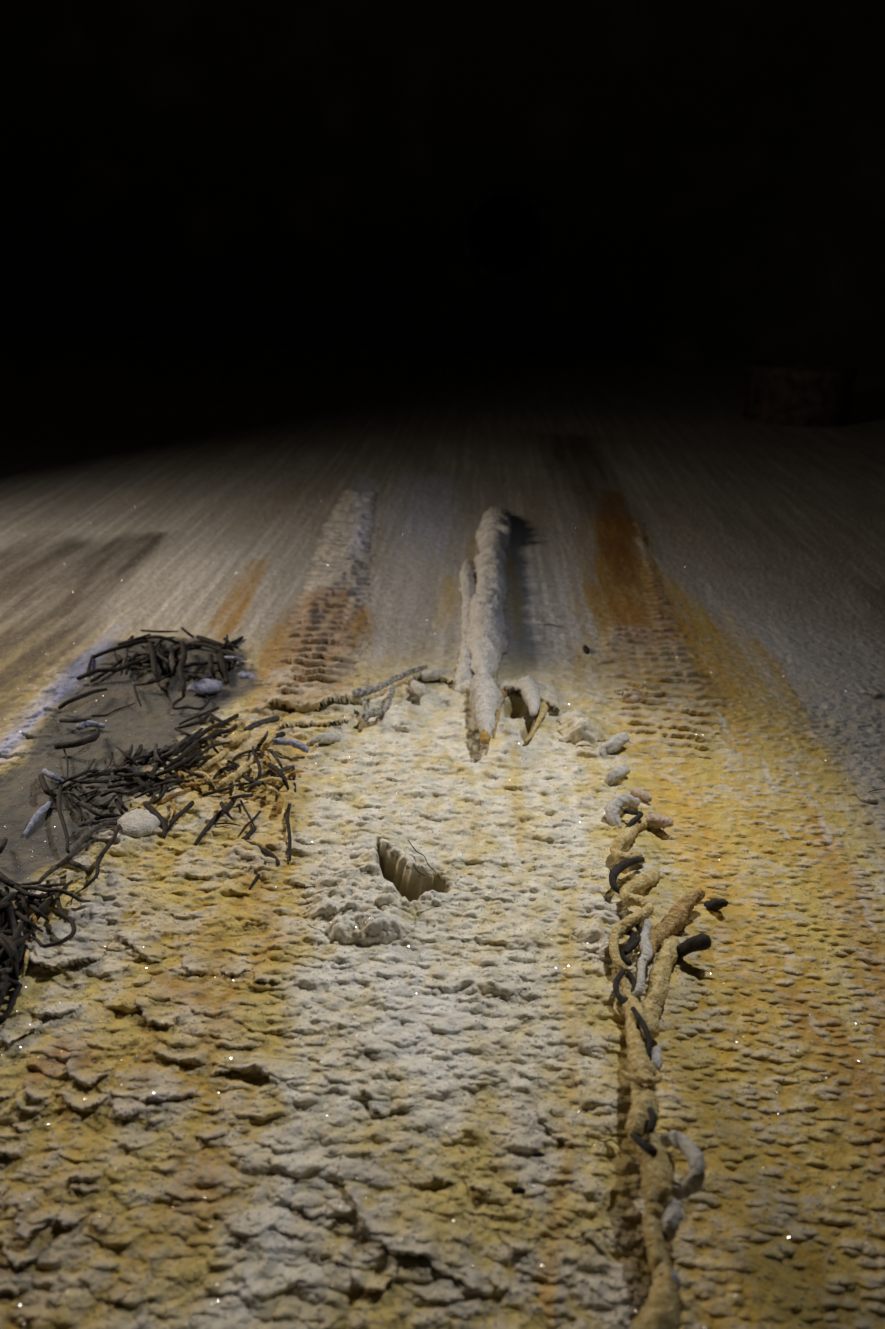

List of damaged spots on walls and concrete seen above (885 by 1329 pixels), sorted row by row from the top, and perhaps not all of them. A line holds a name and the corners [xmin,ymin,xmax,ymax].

corrosion [203,558,273,641]
corrosion [430,536,480,633]
corrosion [503,552,527,640]
corrosion [464,797,487,869]
corrosion [504,742,535,861]
corrosion [0,590,351,1329]
efflorescence [141,471,631,1329]
corrosion [559,490,885,1329]
corrosion [531,890,652,1328]